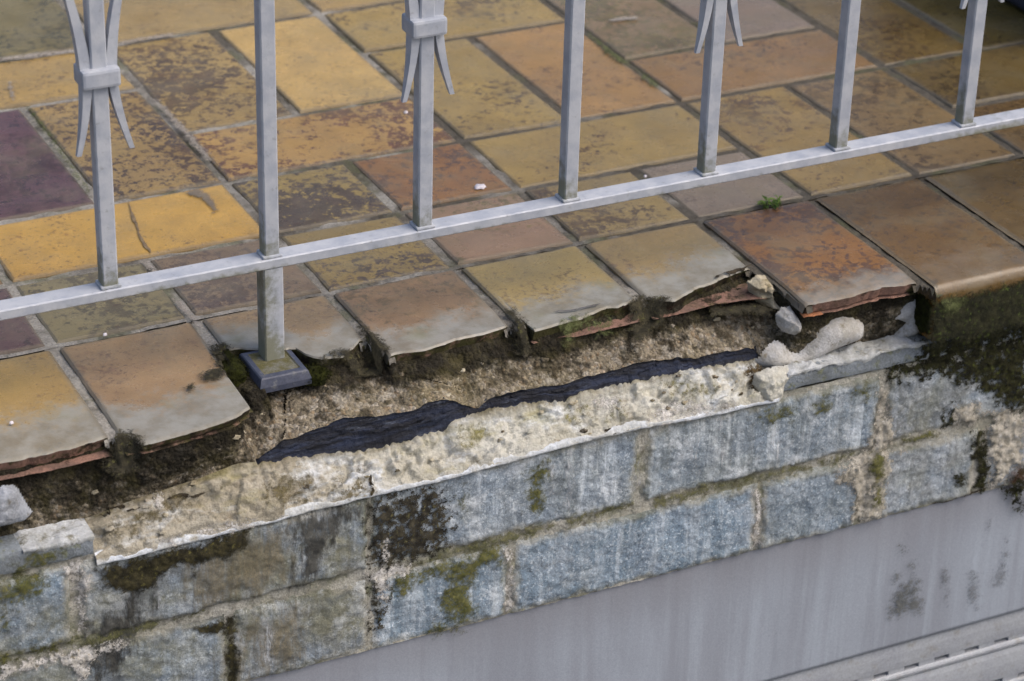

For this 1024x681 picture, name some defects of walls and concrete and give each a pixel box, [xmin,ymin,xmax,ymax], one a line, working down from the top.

crack [128,201,151,253]
spalling [0,274,918,563]
leakage [950,399,1024,490]
leakage [0,394,780,681]
leakage [888,574,925,618]